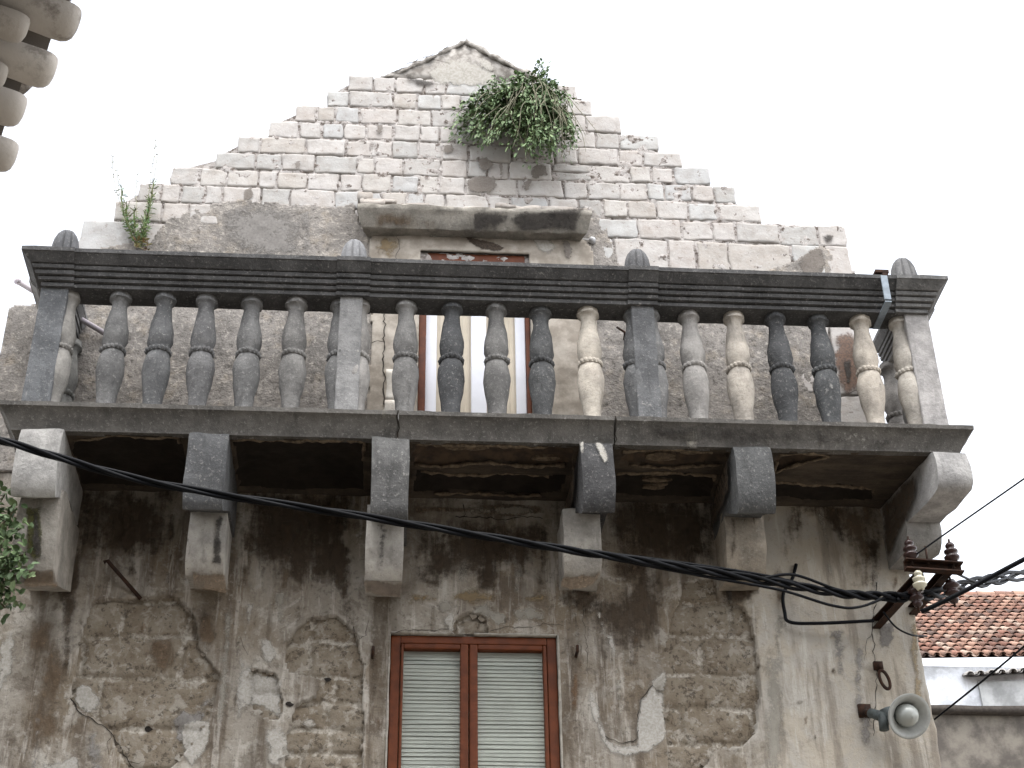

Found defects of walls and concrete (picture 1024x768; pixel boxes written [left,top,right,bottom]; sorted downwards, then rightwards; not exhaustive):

spalling [413,442,607,498]
spalling [615,449,725,497]
spalling [774,452,874,500]
water stain [193,516,226,593]
water stain [245,493,352,621]
water stain [415,504,546,604]
water stain [561,462,728,664]
water stain [789,478,915,585]
crack [70,698,141,768]
flaking render [71,597,220,768]
flaking render [236,617,364,768]
flaking render [589,580,759,768]